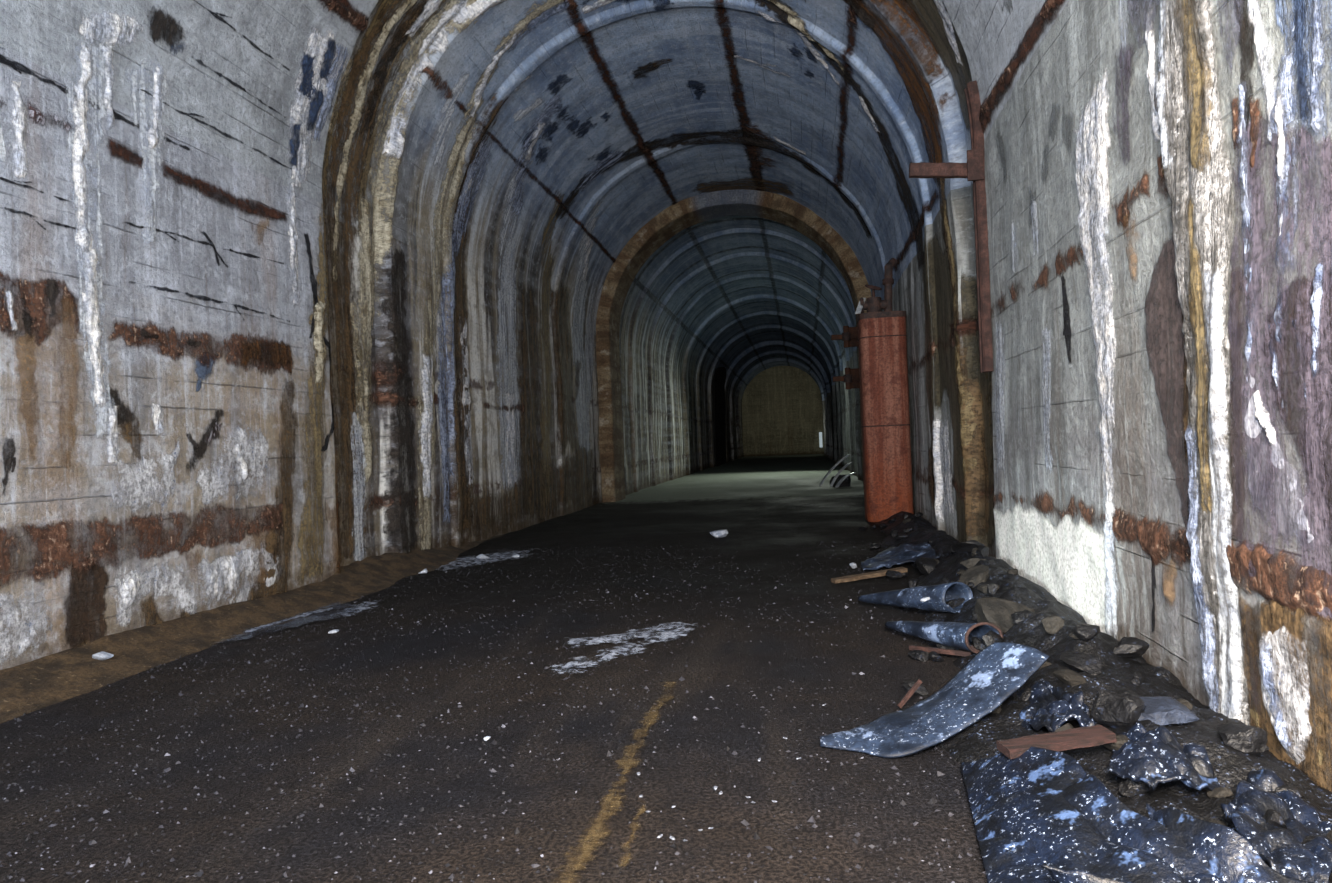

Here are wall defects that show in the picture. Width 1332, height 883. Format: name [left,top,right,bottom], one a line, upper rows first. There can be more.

corrosion [0,271,81,467]
efflorescence [67,12,169,437]
corrosion [109,321,293,374]
leakage [250,0,875,600]
leakage [755,0,1006,545]
leakage [1029,191,1039,255]
leakage [1041,0,1212,639]
corrosion [1097,155,1167,278]
leakage [1145,0,1332,792]
corrosion [0,503,284,586]
corrosion [916,470,1191,604]
corrosion [1226,538,1332,635]